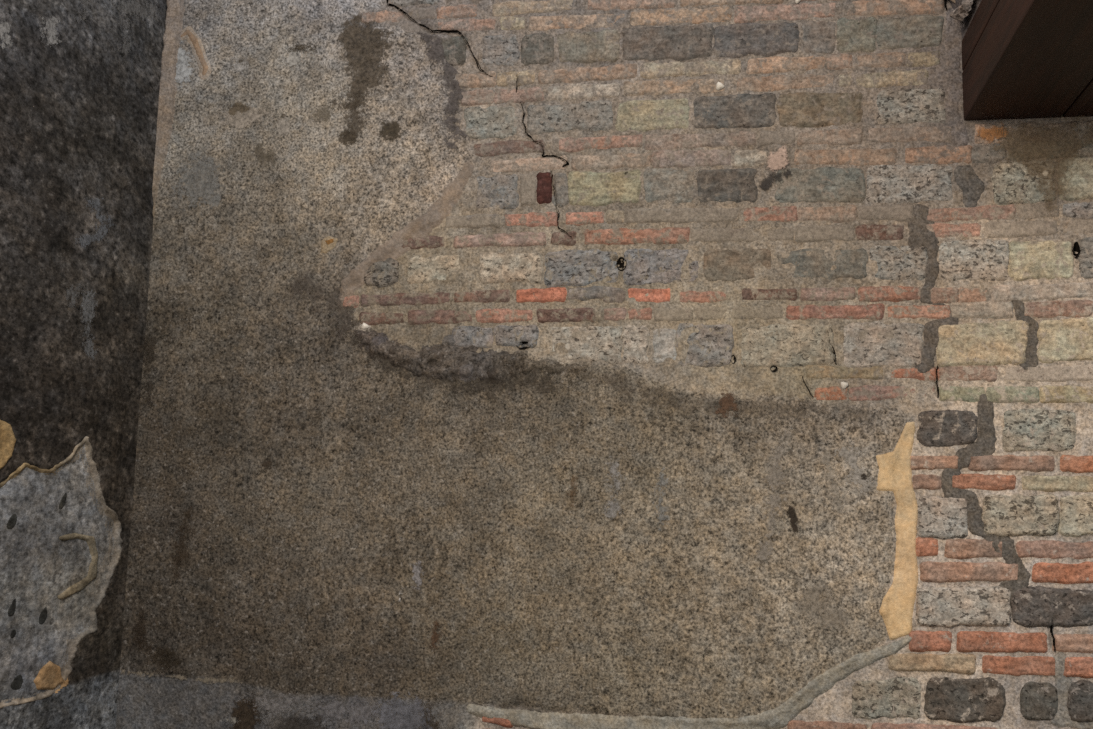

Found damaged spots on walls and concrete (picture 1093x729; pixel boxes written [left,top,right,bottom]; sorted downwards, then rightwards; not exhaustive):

damp [332,14,394,146]
damp [379,121,402,142]
damp [417,32,470,149]
crack [386,0,570,236]
spalling [0,420,123,708]
flaking render [876,422,918,640]